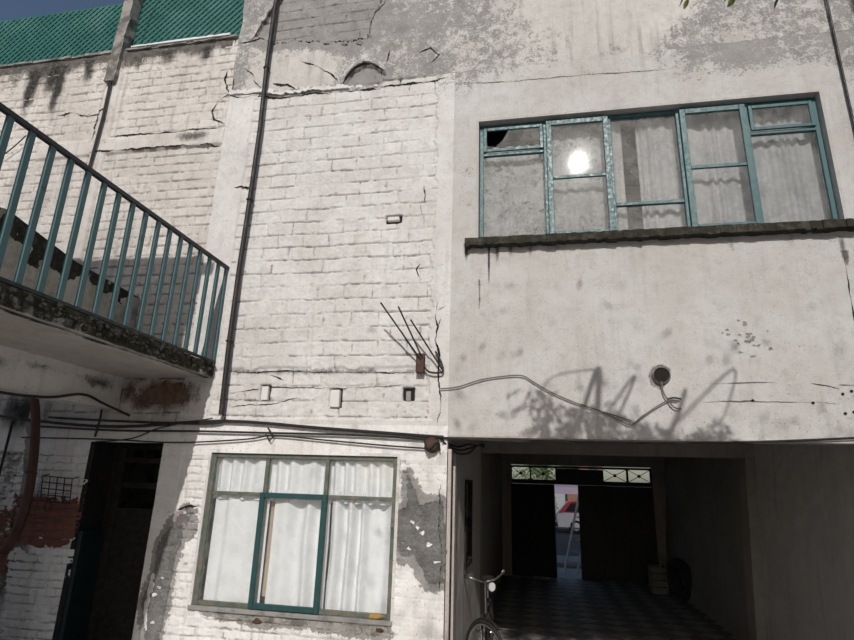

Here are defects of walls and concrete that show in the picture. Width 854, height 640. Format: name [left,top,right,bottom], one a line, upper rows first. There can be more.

damp [0,54,111,109]
damp [123,39,233,68]
flaking render [246,0,390,88]
crack [842,250,854,317]
mould [0,282,216,378]
crack [715,382,792,403]
peeling [0,492,85,573]
peeling [141,505,198,640]
peeling [390,475,447,592]